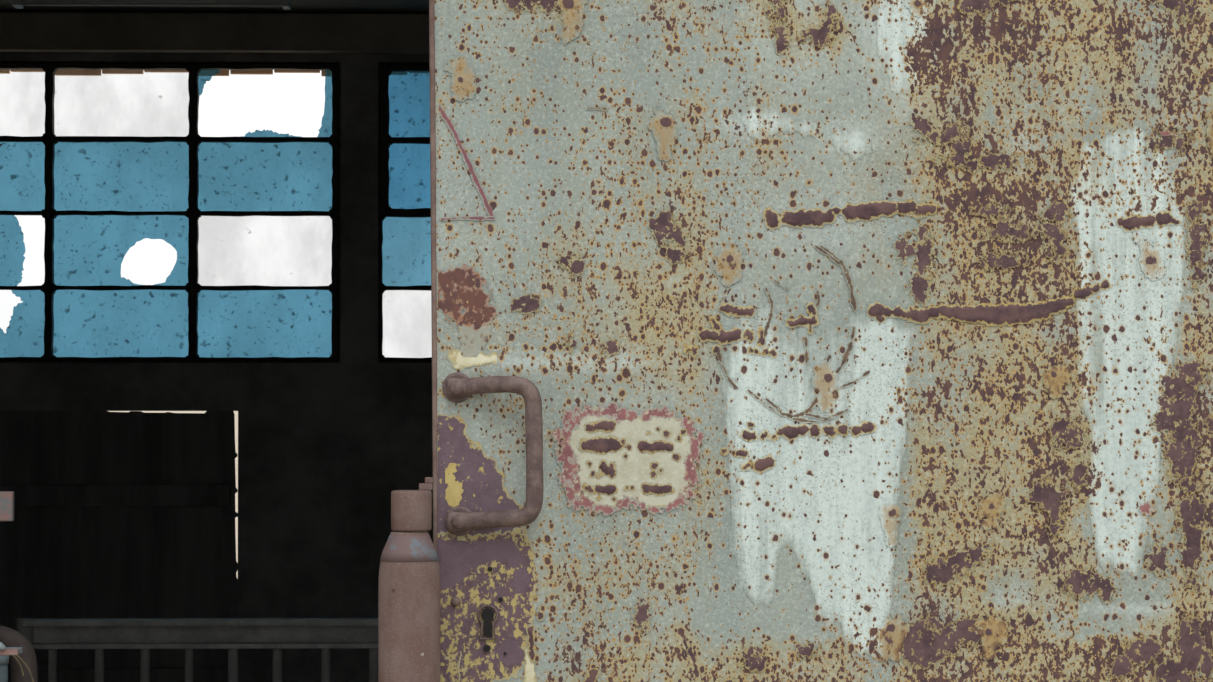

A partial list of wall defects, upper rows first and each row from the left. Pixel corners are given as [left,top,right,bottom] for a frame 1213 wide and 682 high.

rust [765,0,843,57]
rust [438,263,545,357]
rust [648,205,692,265]
rust [683,244,778,359]
rust [762,199,1113,327]
rust [1116,199,1212,291]
rust [720,359,878,474]
rust [1143,358,1211,592]
peeling [438,414,545,682]
rust [1061,566,1120,607]
rust [877,612,1009,670]
rust [1103,611,1213,682]